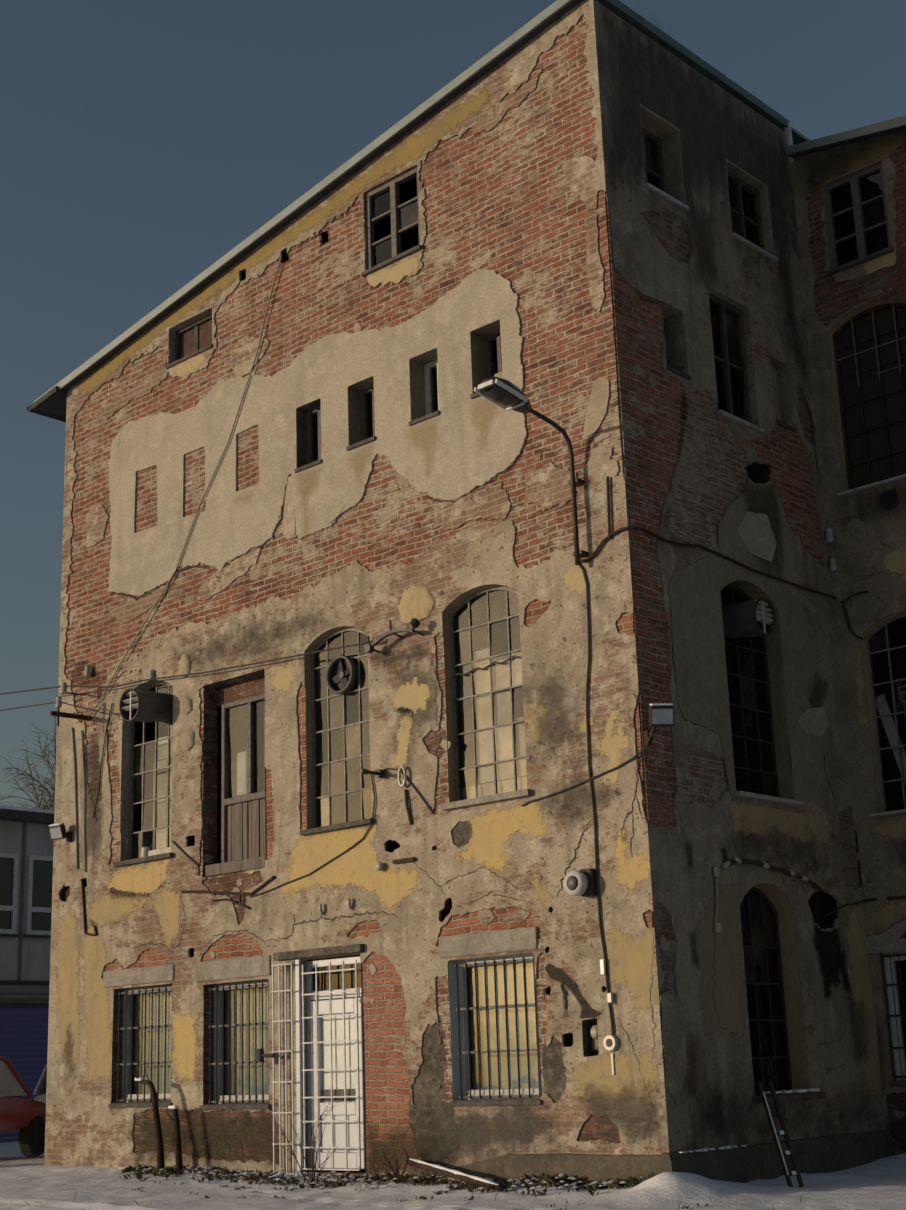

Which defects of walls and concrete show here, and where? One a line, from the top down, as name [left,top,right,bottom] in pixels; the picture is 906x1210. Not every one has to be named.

leakage [604,16,805,370]
spalling [806,143,906,326]
spalling [54,15,688,1086]
spalling [745,462,771,484]
crack [621,745,642,854]
crack [134,900,399,952]
peeling [694,877,746,1041]
spalling [359,952,461,1173]